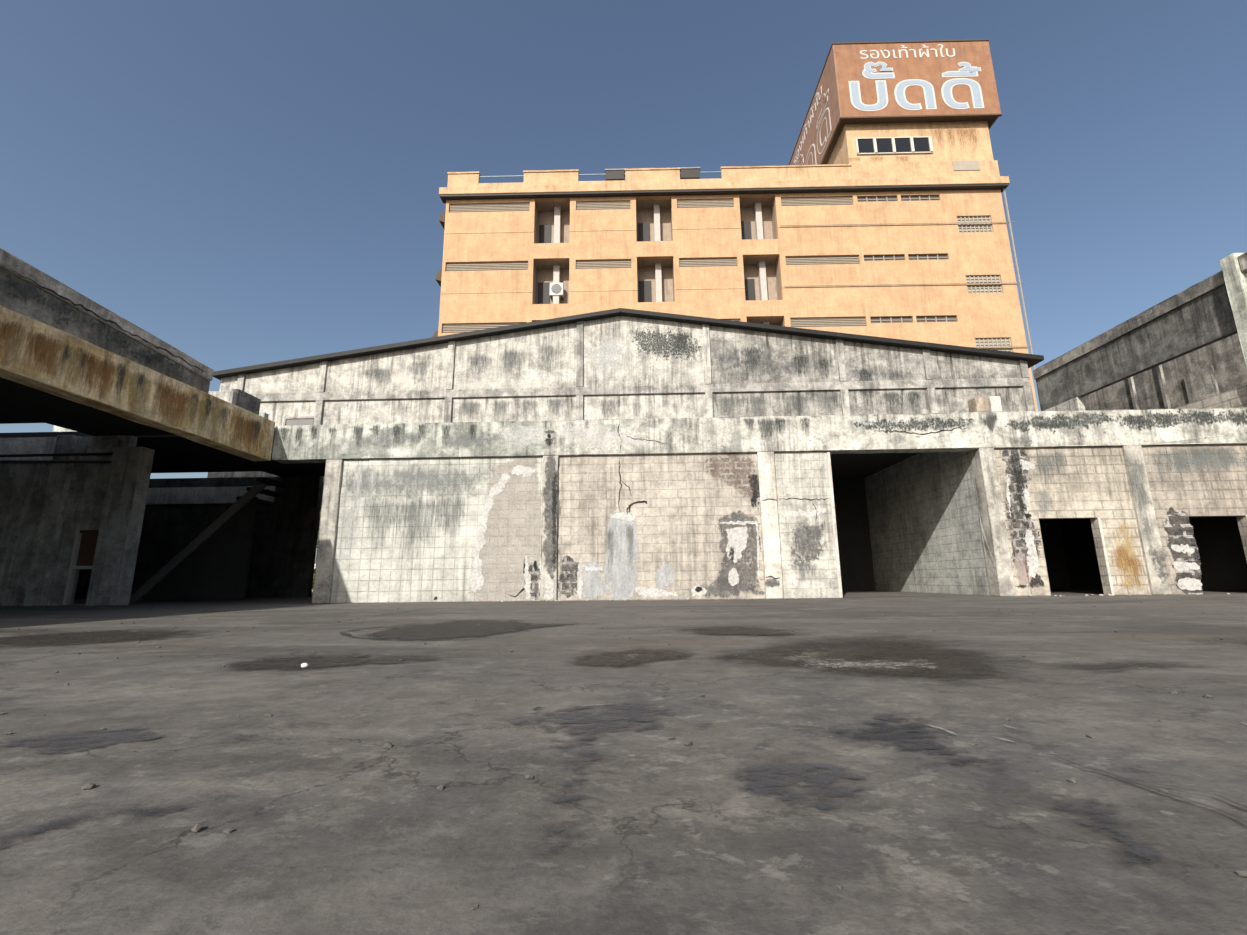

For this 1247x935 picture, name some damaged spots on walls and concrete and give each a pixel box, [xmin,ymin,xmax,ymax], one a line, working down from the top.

rust [0,322,58,376]
leakage [631,326,702,360]
rust [81,354,266,449]
peeling [470,425,554,601]
spalling [706,453,780,589]
peeling [1006,459,1035,517]
peeling [1015,530,1039,588]
rust [1116,525,1141,589]
peeling [1164,507,1203,594]
leakage [0,629,202,647]
leakage [232,620,565,670]
leakage [686,626,1013,681]